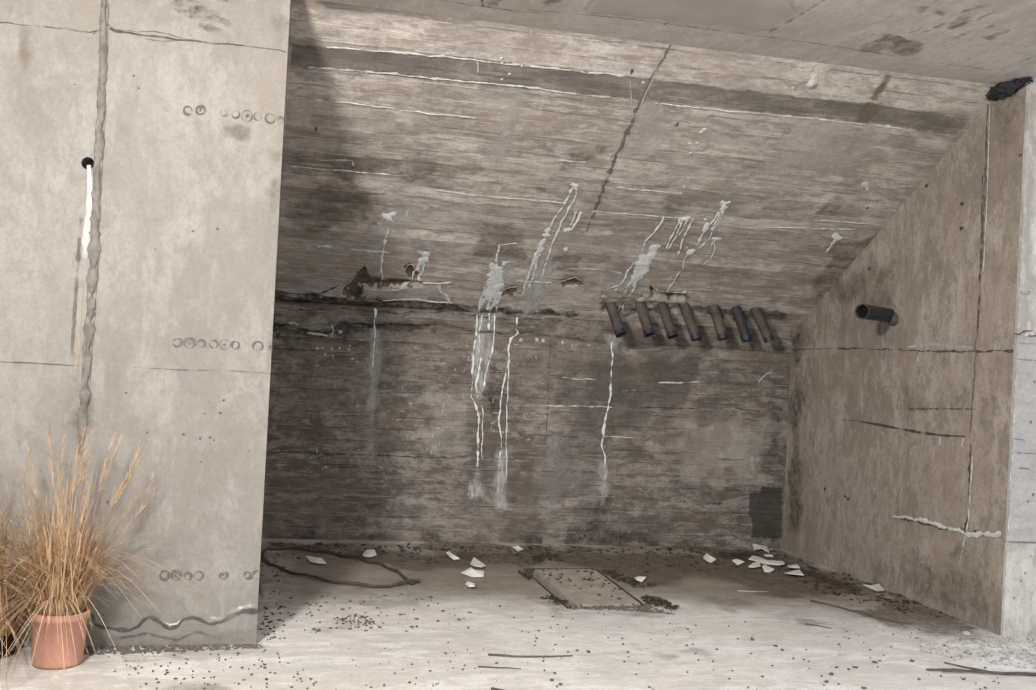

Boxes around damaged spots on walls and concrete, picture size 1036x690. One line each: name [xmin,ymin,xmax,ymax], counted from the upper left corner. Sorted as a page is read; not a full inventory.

crack [446,0,891,230]
leakage [71,282,84,376]
leakage [76,165,93,261]
crack [47,24,613,439]
spalling [275,263,535,315]
leakage [275,182,582,507]
leakage [596,337,637,477]
leakage [608,200,731,311]
crack [630,102,1036,563]